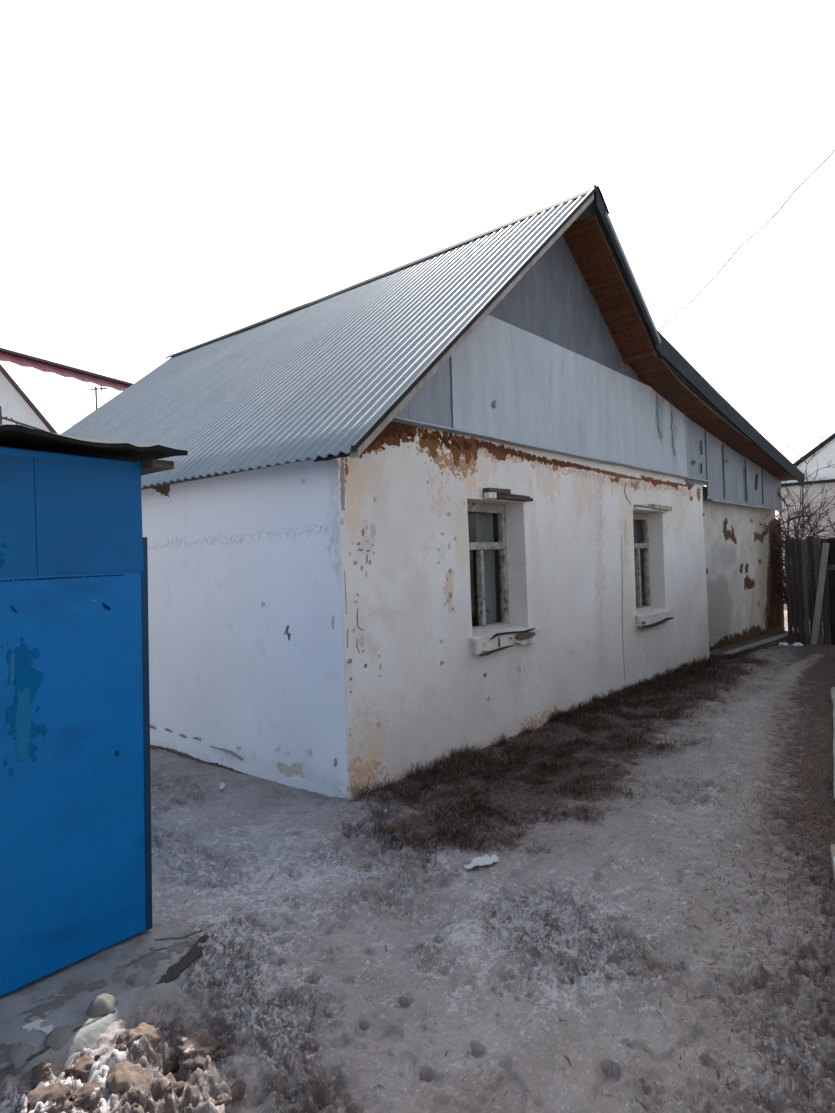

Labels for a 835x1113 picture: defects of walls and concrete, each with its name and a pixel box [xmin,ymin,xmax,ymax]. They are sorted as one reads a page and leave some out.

spalling [359,421,705,516]
peeling [349,519,376,578]
spalling [709,518,785,651]